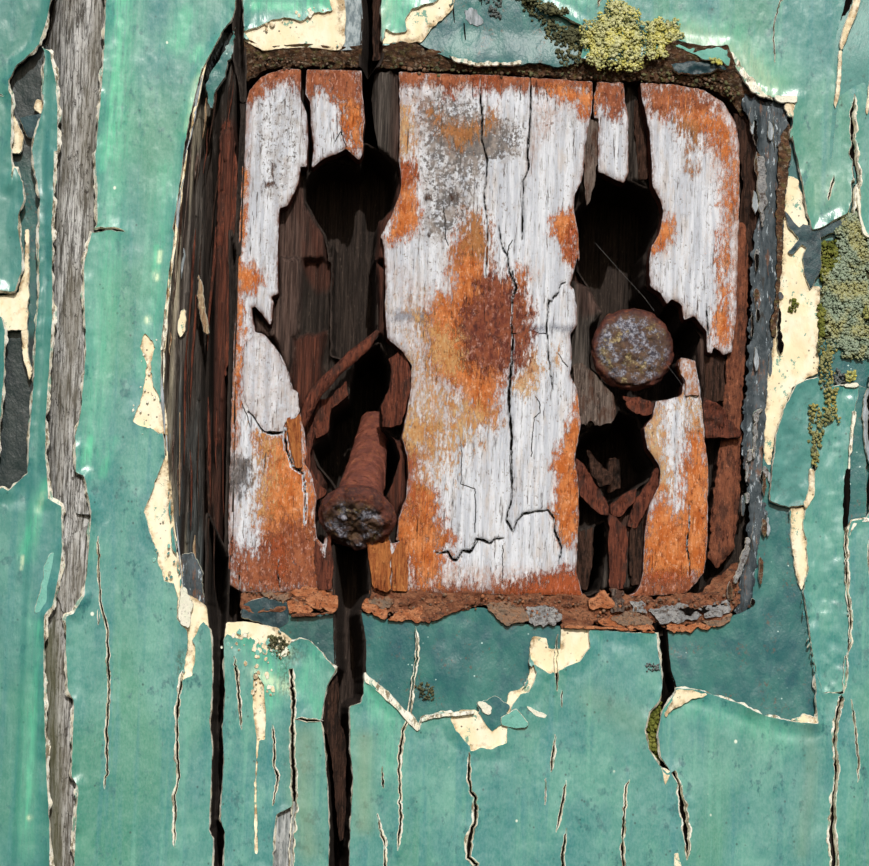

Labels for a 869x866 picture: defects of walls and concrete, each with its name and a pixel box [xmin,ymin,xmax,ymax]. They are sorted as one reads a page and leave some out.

rust [247,69,364,155]
crack [359,0,384,79]
peeling [382,0,582,68]
rust [399,72,628,153]
peeling [0,0,105,866]
crack [204,0,306,866]
rust [229,414,339,628]
peeling [360,607,589,751]
crack [436,77,568,584]
rust [360,204,741,634]
peeling [664,95,869,723]
crack [826,527,869,866]